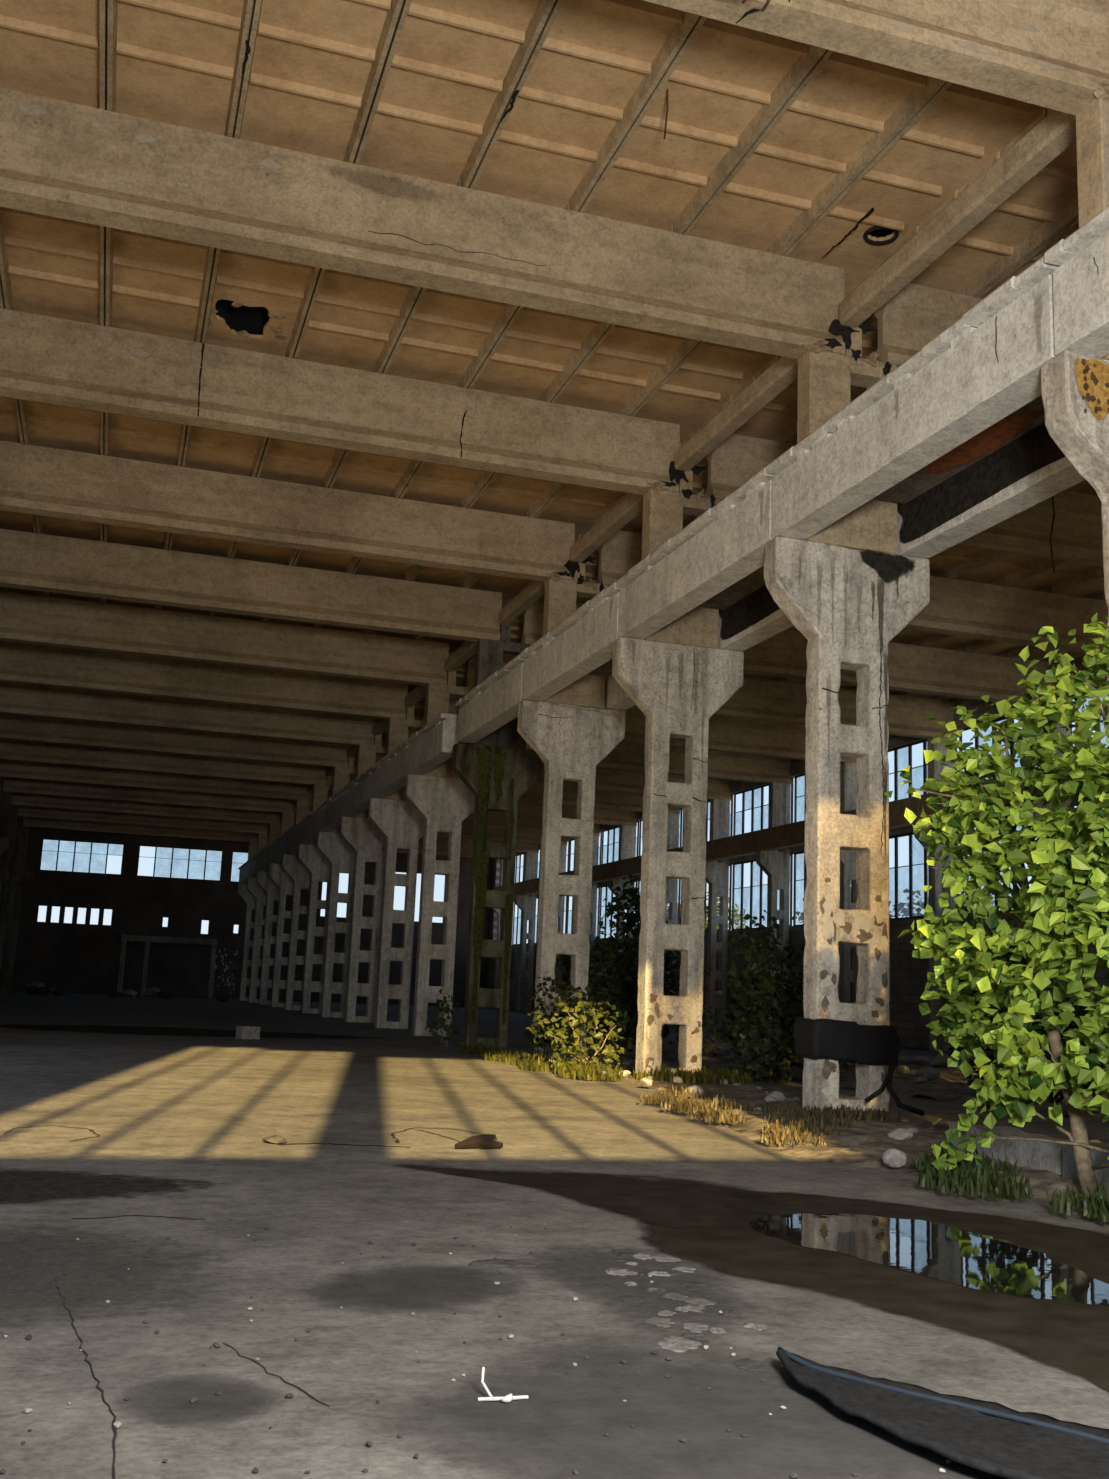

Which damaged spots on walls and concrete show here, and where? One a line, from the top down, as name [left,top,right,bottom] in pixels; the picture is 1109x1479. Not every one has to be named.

crack [736,0,790,23]
rust [1075,358,1109,420]
crack [54,1279,117,1479]
crack [223,1343,330,1406]